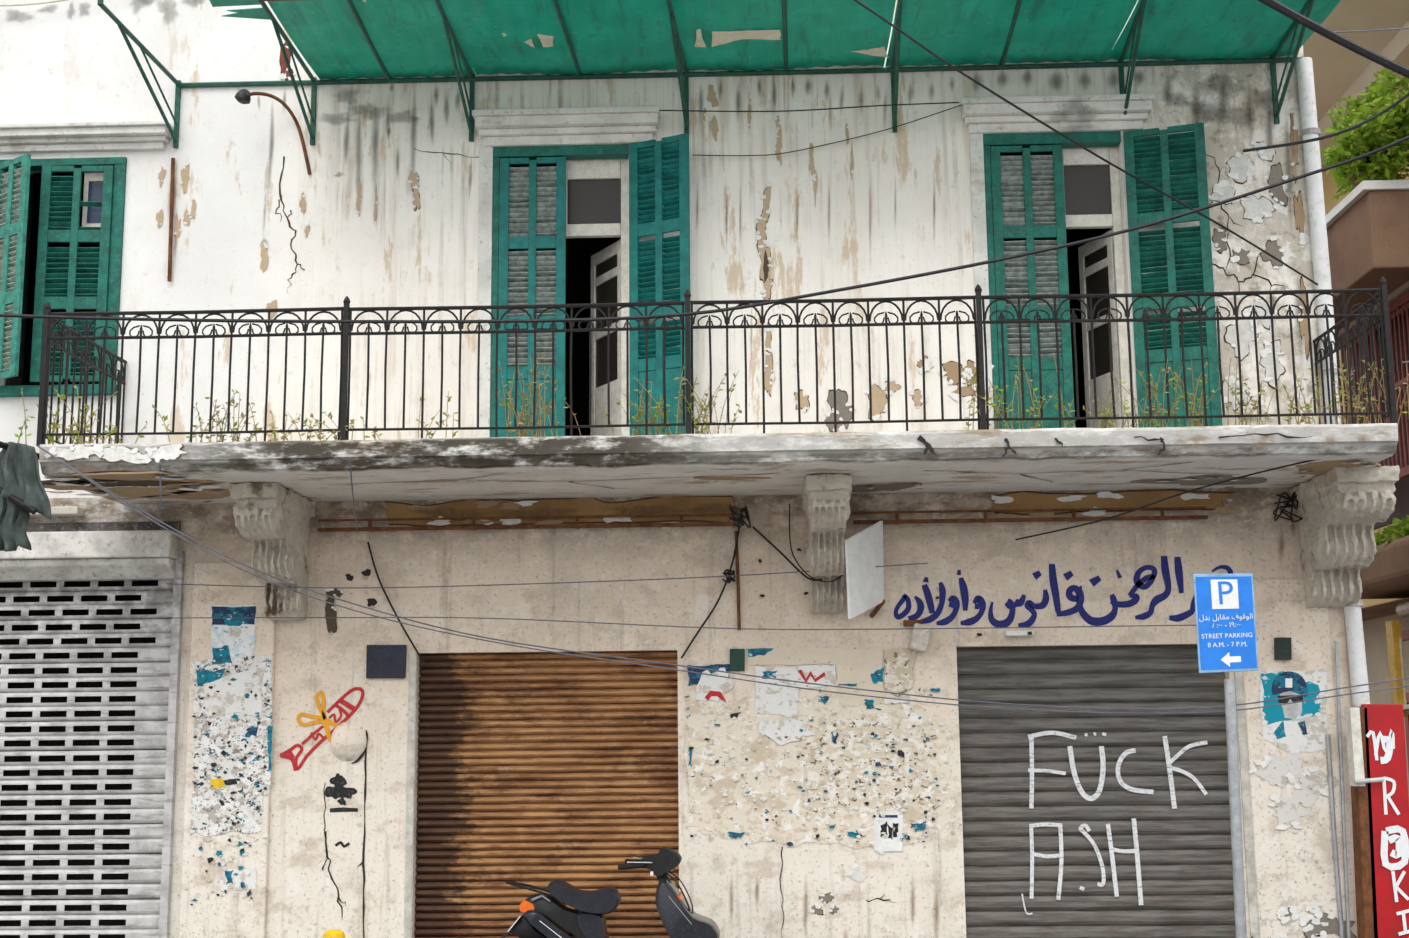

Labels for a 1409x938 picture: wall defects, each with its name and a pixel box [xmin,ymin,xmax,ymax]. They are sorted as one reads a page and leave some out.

crack [275,156,305,292]
peeling [702,84,719,142]
flaking render [755,181,774,300]
peeling [774,115,782,165]
peeling [808,143,818,205]
peeling [845,123,855,179]
peeling [1208,109,1306,269]
flaking render [764,323,775,397]
peeling [794,356,994,432]
peeling [1220,299,1286,411]
flaking render [1298,276,1310,360]
flaking render [384,476,771,526]